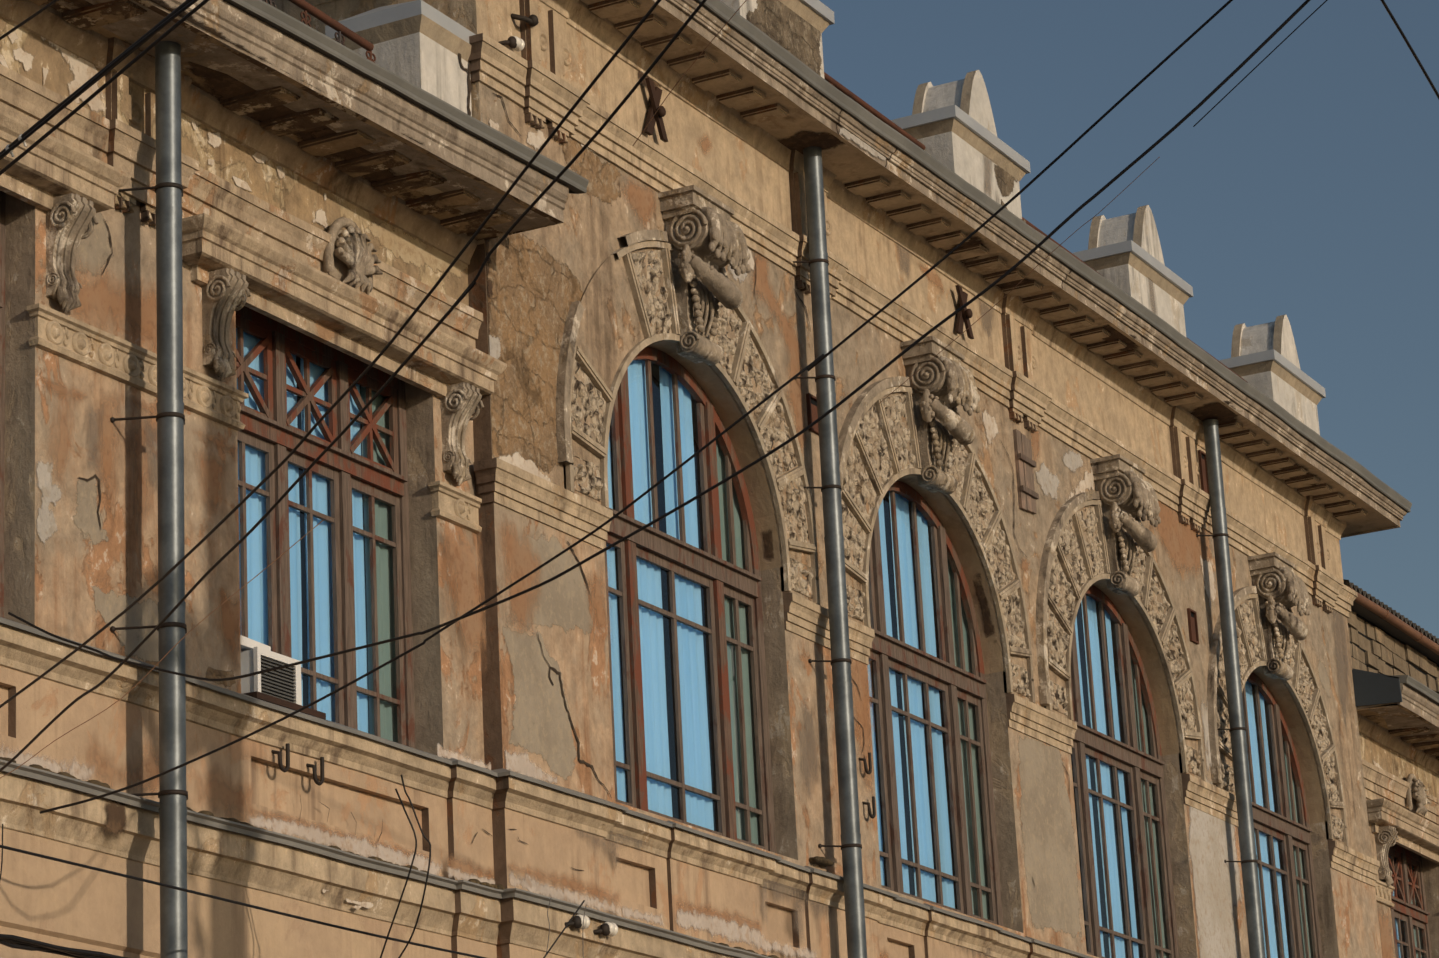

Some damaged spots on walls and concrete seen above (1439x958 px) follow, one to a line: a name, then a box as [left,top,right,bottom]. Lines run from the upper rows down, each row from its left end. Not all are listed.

peeling [0,31,48,86]
peeling [41,36,106,113]
peeling [37,461,61,543]
crack [567,541,591,595]
crack [538,635,612,798]
leakage [250,816,824,958]